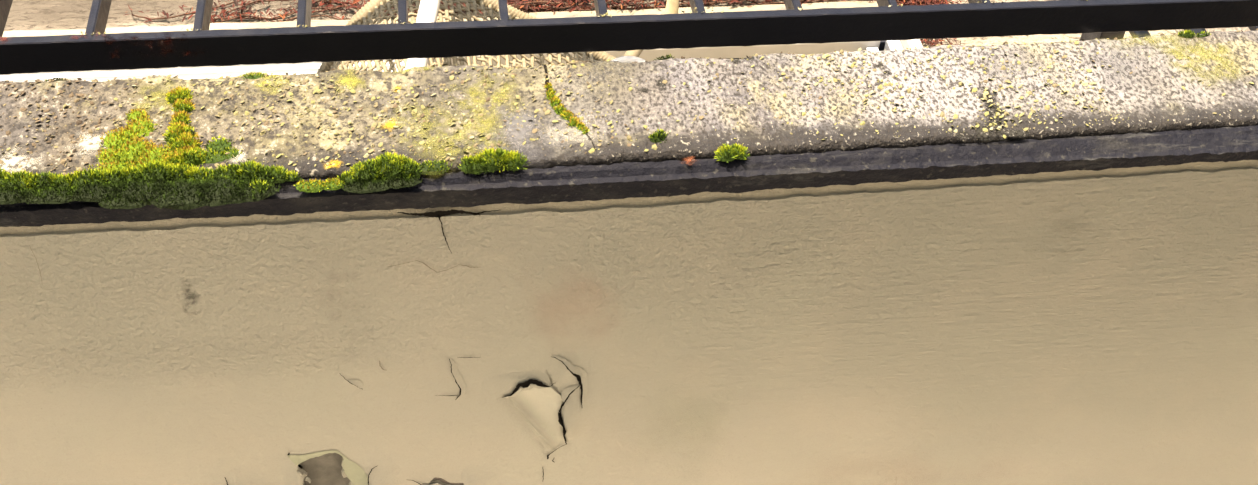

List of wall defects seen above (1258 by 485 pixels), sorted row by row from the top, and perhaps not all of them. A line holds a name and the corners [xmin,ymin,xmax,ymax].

crack [388,209,499,273]
peeling [282,350,610,485]